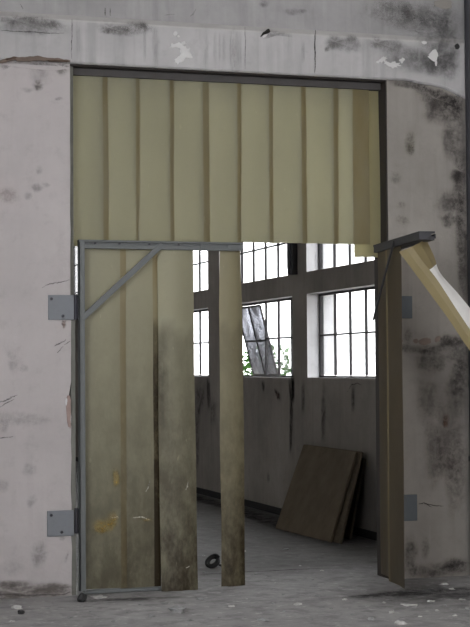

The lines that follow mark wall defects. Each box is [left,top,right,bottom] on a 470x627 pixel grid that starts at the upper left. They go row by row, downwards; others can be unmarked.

peeling [376,56,405,69]